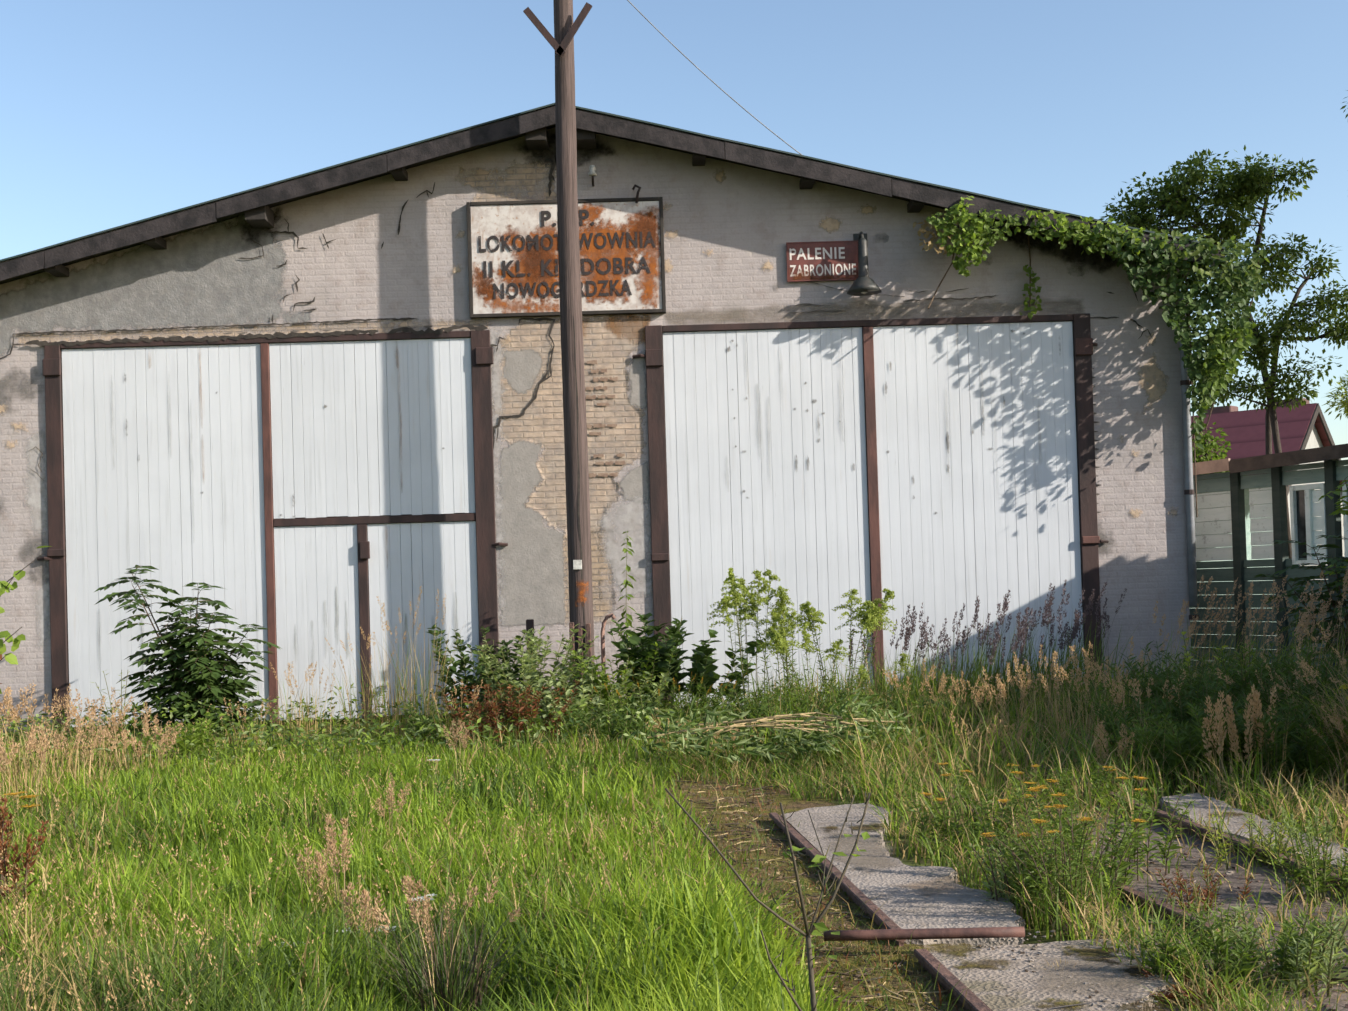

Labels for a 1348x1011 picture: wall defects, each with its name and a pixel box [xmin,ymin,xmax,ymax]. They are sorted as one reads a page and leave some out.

crack [0,218,416,359]
crack [381,183,435,249]
flaking render [493,319,570,619]
crack [490,316,585,651]
flaking render [583,316,650,623]